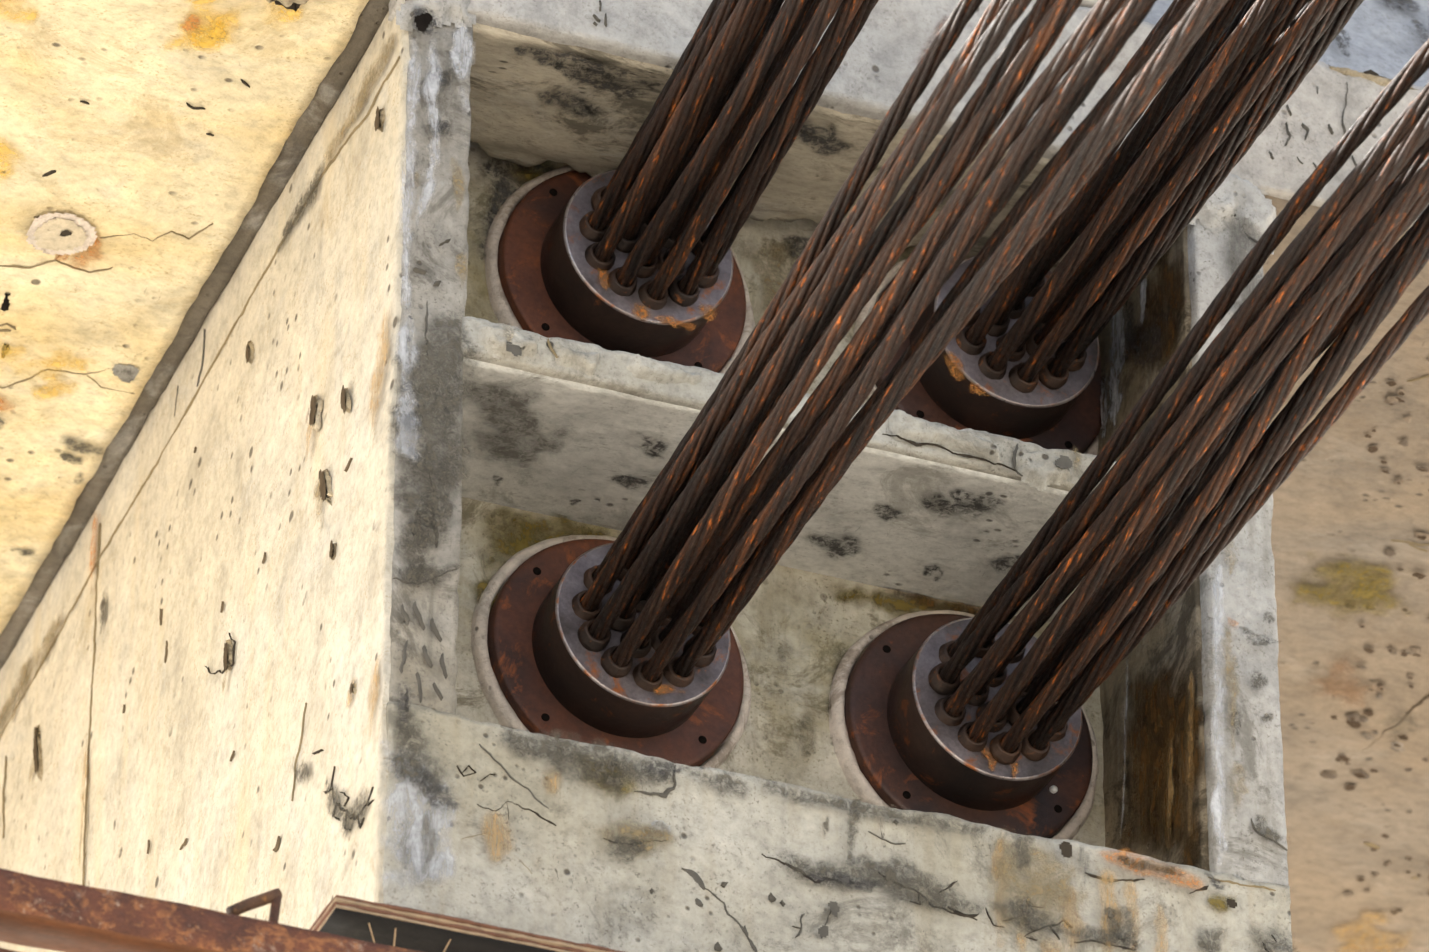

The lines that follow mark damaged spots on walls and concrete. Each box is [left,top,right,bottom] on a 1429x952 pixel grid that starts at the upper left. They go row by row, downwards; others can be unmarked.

corrosion [171,0,237,48]
spalling [267,0,309,12]
corrosion [280,5,301,22]
water stain [514,46,660,115]
water stain [402,26,473,309]
crack [0,223,213,273]
crack [0,355,137,394]
water stain [370,317,563,584]
water stain [487,500,608,563]
water stain [1121,542,1268,866]
crack [681,868,757,952]
crack [792,901,840,939]